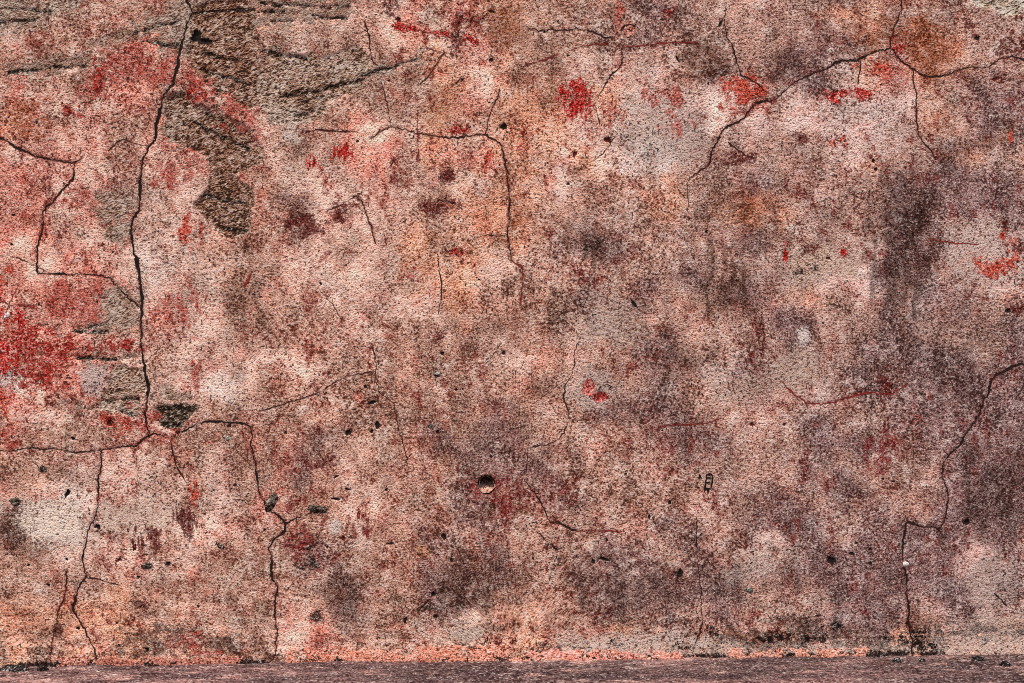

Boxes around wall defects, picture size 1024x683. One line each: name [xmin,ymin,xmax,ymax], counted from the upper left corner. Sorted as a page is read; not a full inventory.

crack [306,20,525,314]
crack [686,0,1024,205]
crack [0,0,408,665]
crack [901,363,1024,656]